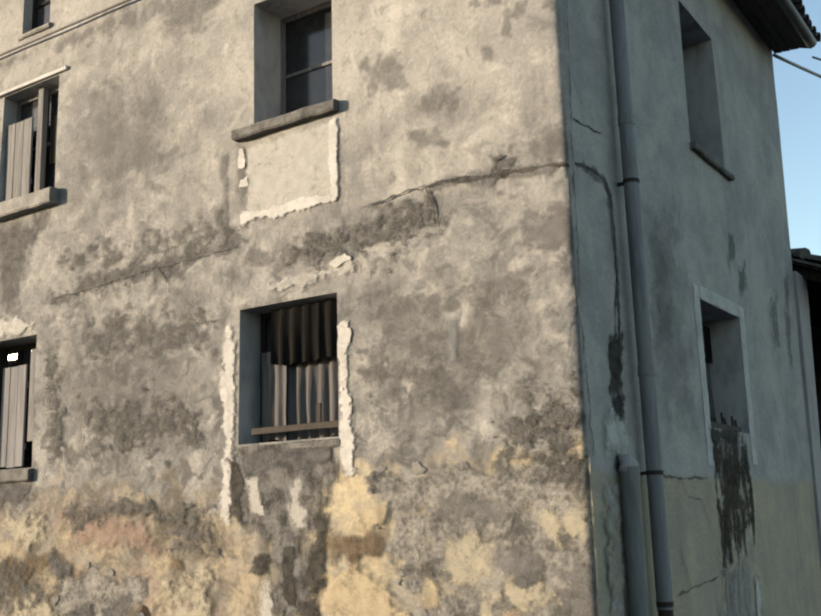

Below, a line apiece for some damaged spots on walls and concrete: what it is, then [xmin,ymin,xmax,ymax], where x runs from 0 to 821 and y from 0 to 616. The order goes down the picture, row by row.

flaking render [238,117,338,224]
crack [364,1,621,456]
flaking render [337,320,355,477]
water stain [227,439,385,616]
flaking render [320,412,597,616]
peeling [604,487,625,616]
crack [663,475,710,524]
mould [711,429,755,576]